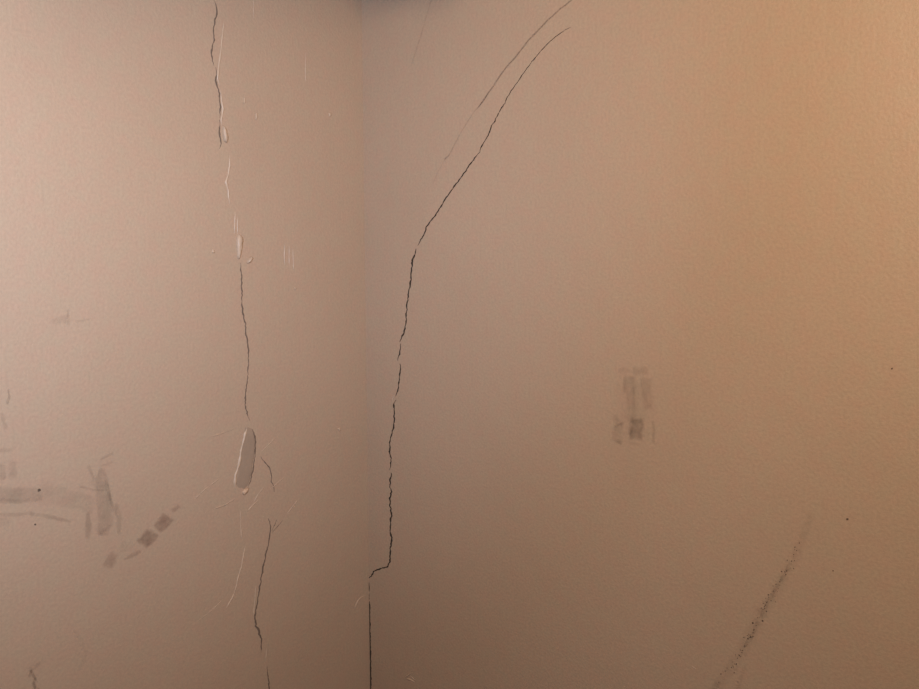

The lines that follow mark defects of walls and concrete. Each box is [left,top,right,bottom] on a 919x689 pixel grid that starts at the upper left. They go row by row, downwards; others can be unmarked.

crack [211,3,238,234]
peeling [236,427,255,489]
crack [233,263,274,495]
crack [369,28,569,689]
crack [253,518,279,689]